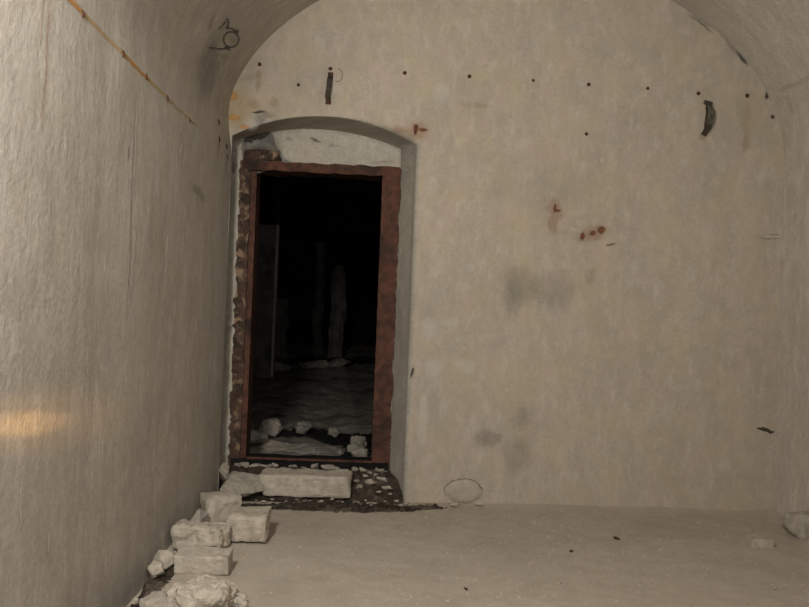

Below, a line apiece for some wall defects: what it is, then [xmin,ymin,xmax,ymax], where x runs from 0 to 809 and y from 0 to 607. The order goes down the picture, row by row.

rust [69,0,195,124]